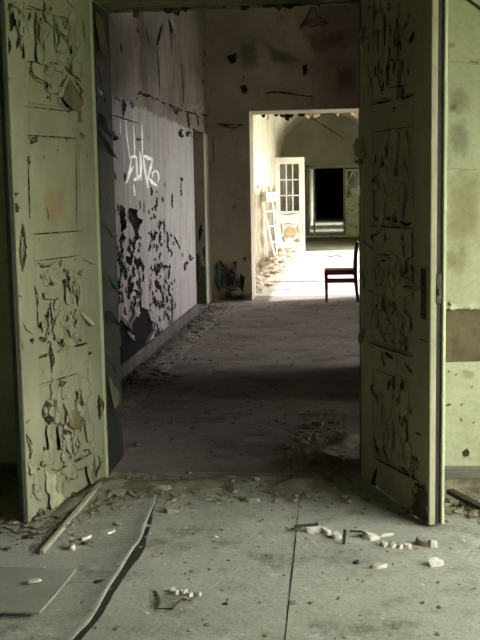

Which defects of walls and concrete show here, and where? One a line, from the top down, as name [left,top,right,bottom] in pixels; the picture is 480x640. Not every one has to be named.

peeling [8,0,85,123]
peeling [96,63,209,158]
flaking render [261,113,320,121]
peeling [100,166,206,408]
peeling [215,257,246,292]
flaking render [445,301,480,362]
peeling [23,255,105,521]